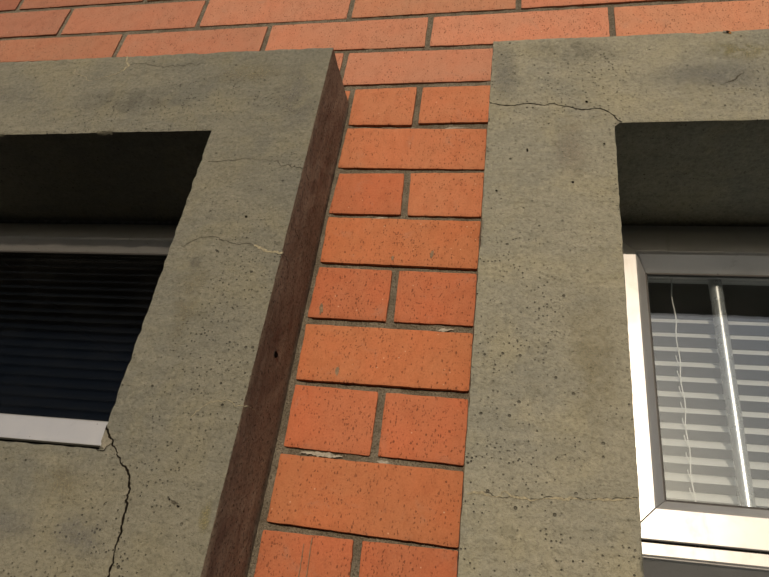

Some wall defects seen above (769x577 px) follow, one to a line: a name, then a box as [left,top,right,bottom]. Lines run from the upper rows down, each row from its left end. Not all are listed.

crack [490,102,622,122]
crack [181,236,288,261]
crack [96,425,131,577]
crack [467,491,638,501]